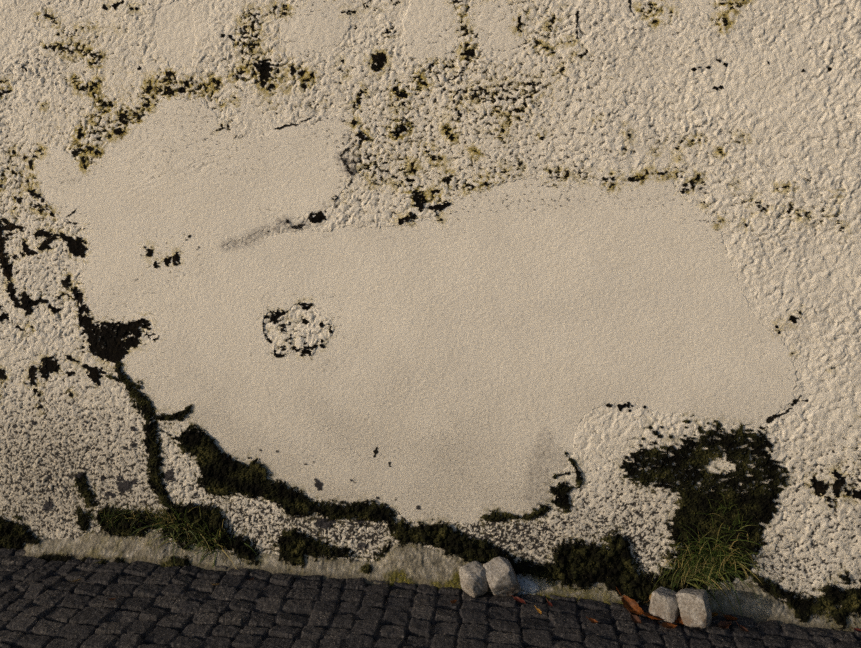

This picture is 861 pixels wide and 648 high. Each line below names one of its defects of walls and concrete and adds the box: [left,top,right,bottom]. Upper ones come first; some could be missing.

damp [635,0,673,27]
damp [710,0,750,33]
damp [36,0,316,173]
damp [337,0,591,226]
damp [543,134,725,207]
damp [267,211,326,232]
damp [776,178,851,240]
damp [0,145,159,411]
damp [804,447,861,508]